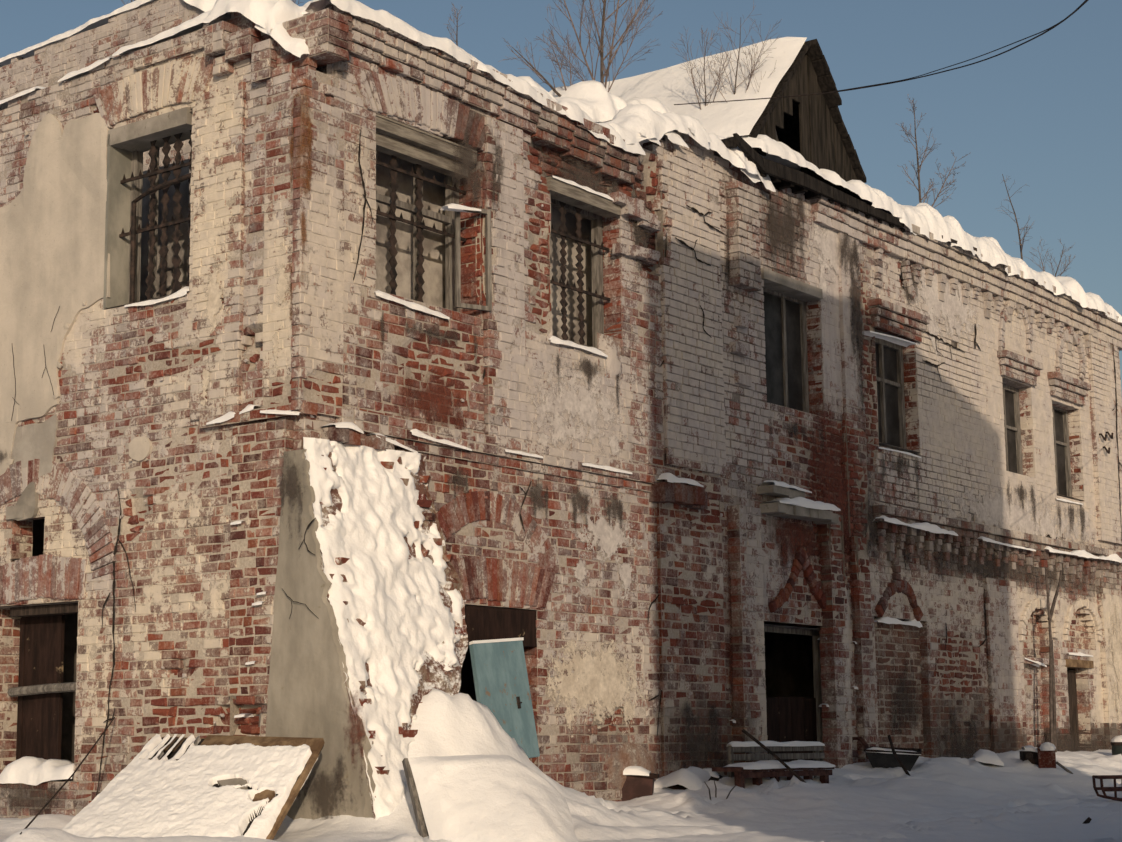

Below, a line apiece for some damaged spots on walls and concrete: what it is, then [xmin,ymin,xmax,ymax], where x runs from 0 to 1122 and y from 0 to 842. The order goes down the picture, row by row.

crack [353,130,373,280]
crack [665,205,724,266]
leakage [767,198,804,259]
crack [11,306,60,421]
flaking render [0,107,110,476]
spalling [126,240,225,407]
crack [299,518,315,555]
peeling [557,507,643,606]
leakage [1007,486,1036,517]
leakage [1058,505,1085,534]
spalling [118,698,261,753]
peeling [545,630,651,738]